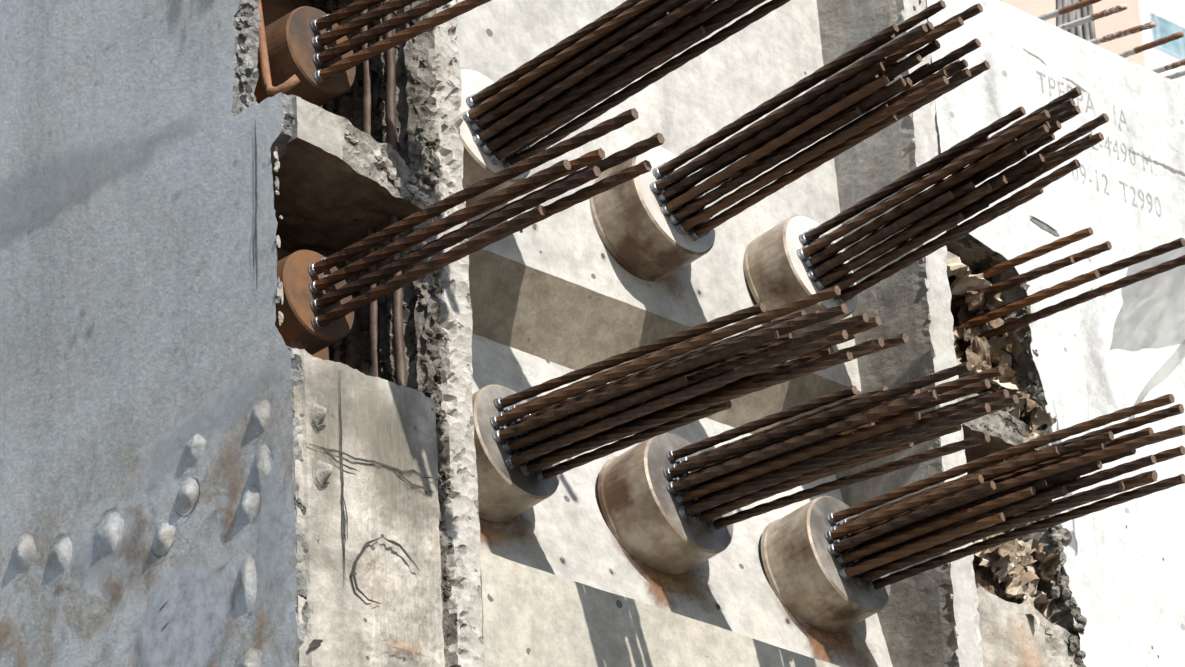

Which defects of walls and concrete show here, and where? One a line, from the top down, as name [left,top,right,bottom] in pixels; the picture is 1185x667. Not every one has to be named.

spalling [237,0,301,112]
crack [251,129,259,290]
spalling [275,277,284,326]
spalling [417,259,451,532]
spalling [1025,334,1048,436]
crack [308,370,438,604]
spalling [441,567,452,599]
spalling [1045,512,1087,667]